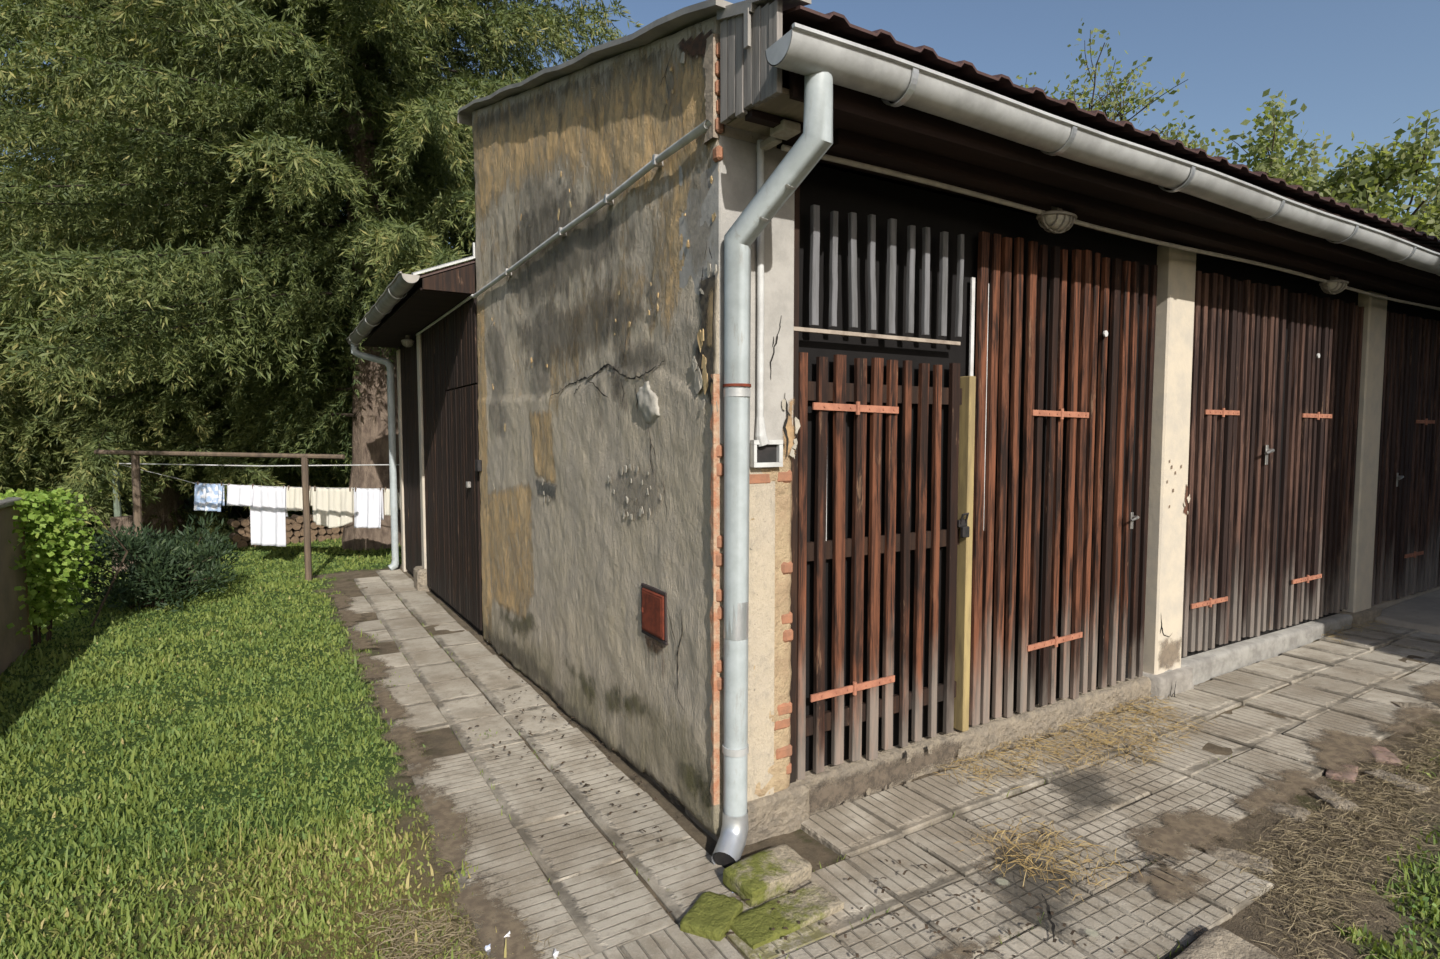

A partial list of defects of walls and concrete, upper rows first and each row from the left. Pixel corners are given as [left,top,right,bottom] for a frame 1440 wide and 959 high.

spalling [535,478,556,503]
crack [552,305,667,513]
spalling [692,262,724,805]